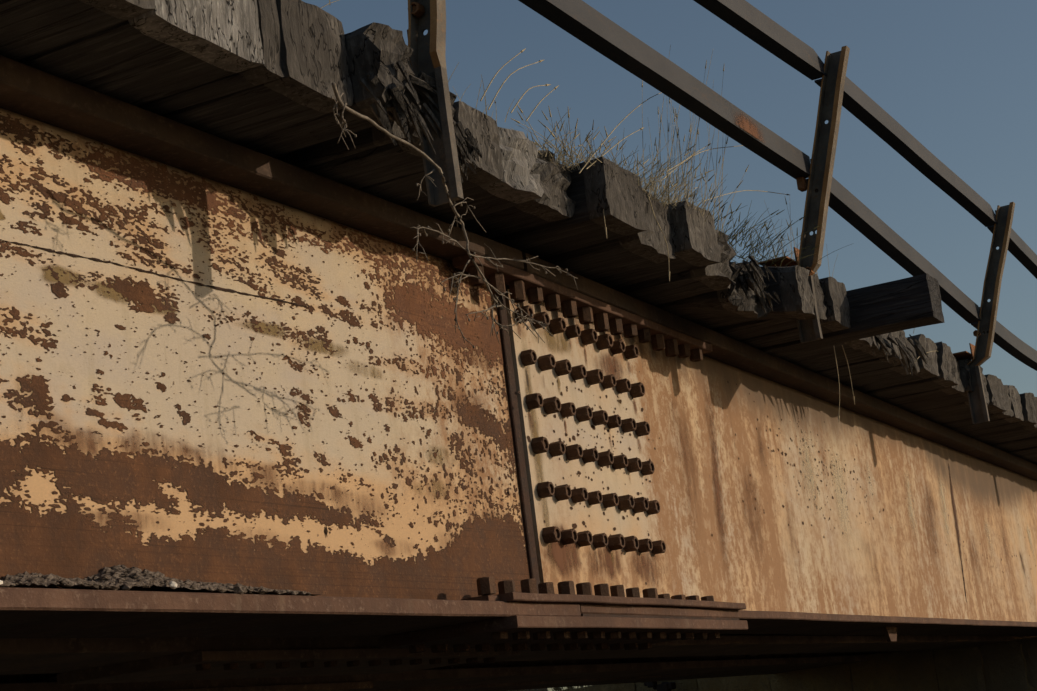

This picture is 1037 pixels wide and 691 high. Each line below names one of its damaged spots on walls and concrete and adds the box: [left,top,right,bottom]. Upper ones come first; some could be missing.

crack [0,239,307,307]
corrosion [0,112,530,600]
corrosion [552,356,644,418]
corrosion [529,414,664,491]
corrosion [547,479,651,577]